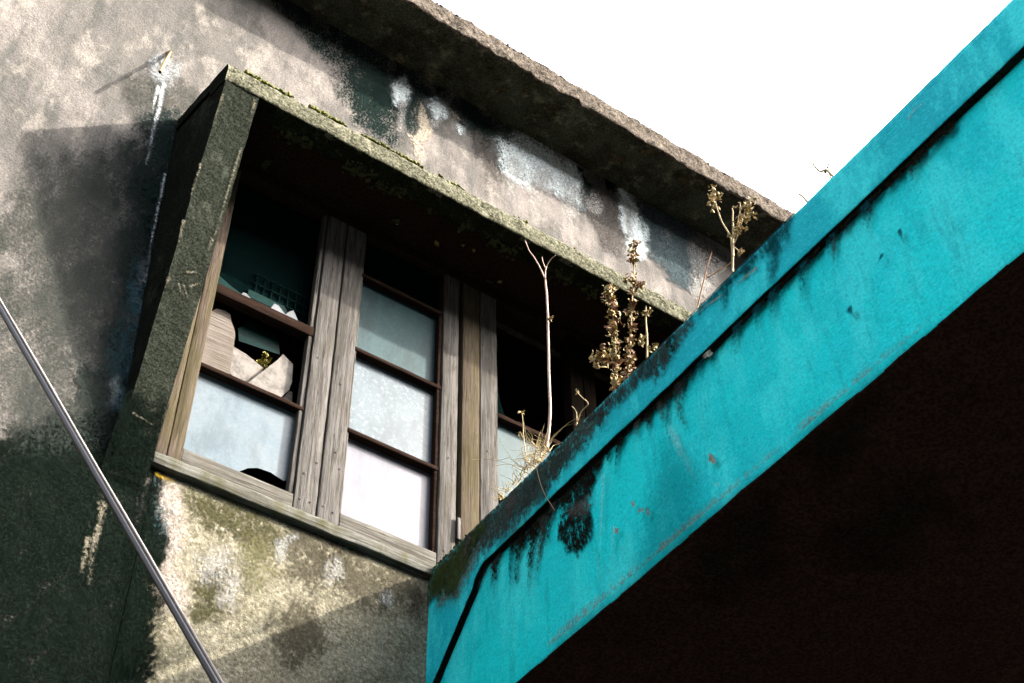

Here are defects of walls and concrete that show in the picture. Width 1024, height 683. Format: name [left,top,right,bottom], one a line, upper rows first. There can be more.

water stain [0,55,424,683]
water stain [270,0,727,292]
water stain [428,116,956,607]